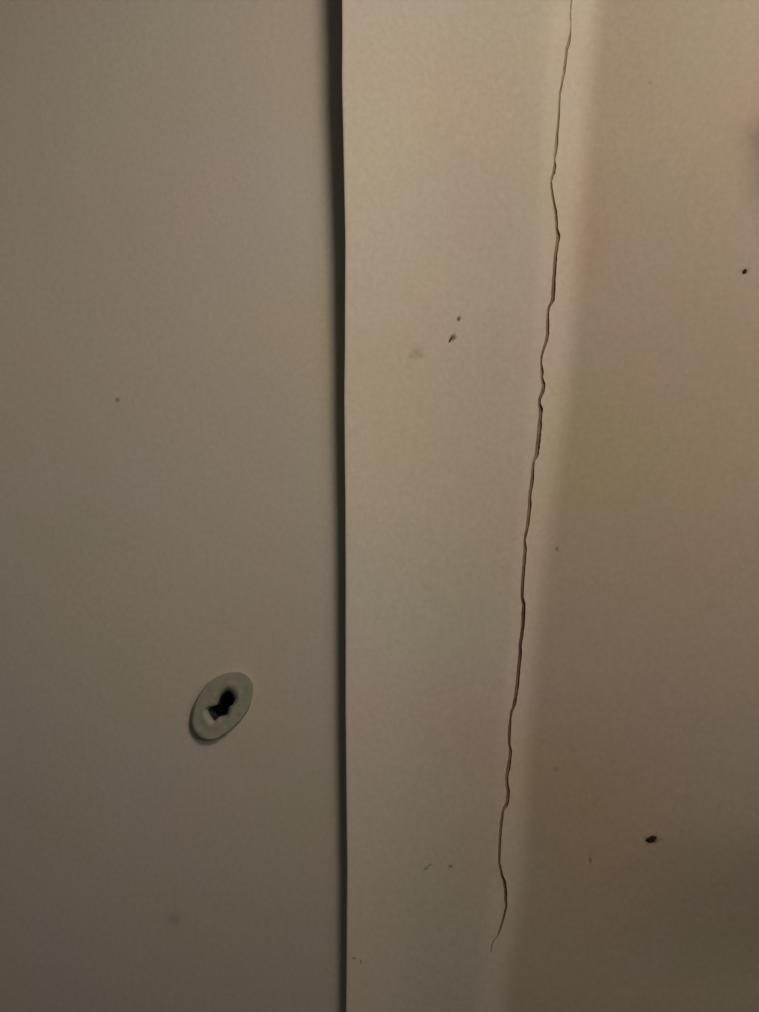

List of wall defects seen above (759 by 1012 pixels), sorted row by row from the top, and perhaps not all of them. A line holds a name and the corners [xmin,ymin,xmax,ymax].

crack [491,0,572,951]